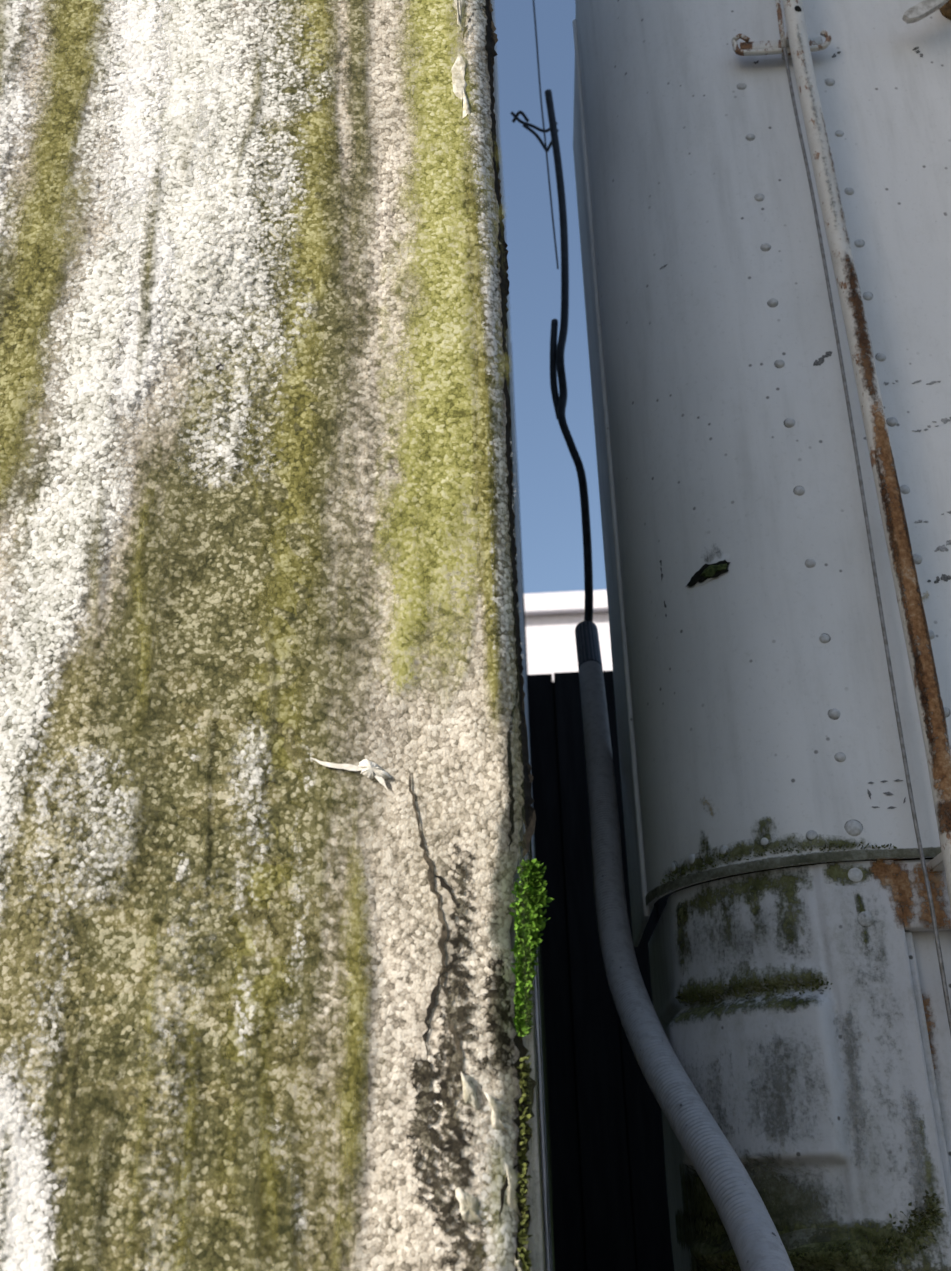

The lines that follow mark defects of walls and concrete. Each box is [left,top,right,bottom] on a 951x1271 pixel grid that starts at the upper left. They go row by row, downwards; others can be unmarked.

water stain [465,0,522,720]
water stain [0,0,388,1271]
water stain [373,427,434,692]
water stain [406,1054,455,1213]
crack [408,769,467,1072]
water stain [481,958,516,1076]